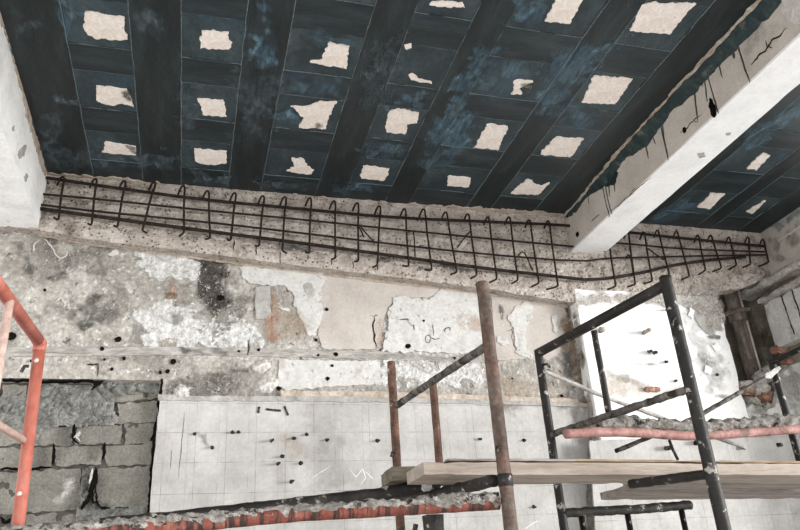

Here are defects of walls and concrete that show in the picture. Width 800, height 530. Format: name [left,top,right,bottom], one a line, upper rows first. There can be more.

peeling [83,11,128,41]
peeling [199,29,232,50]
peeling [630,1,696,35]
crack [751,28,786,65]
peeling [581,75,633,104]
peeling [291,101,337,129]
peeling [385,108,419,134]
peeling [474,123,508,150]
damp [566,0,781,218]
spalling [40,175,769,359]
crack [147,379,163,513]
crack [80,442,110,510]